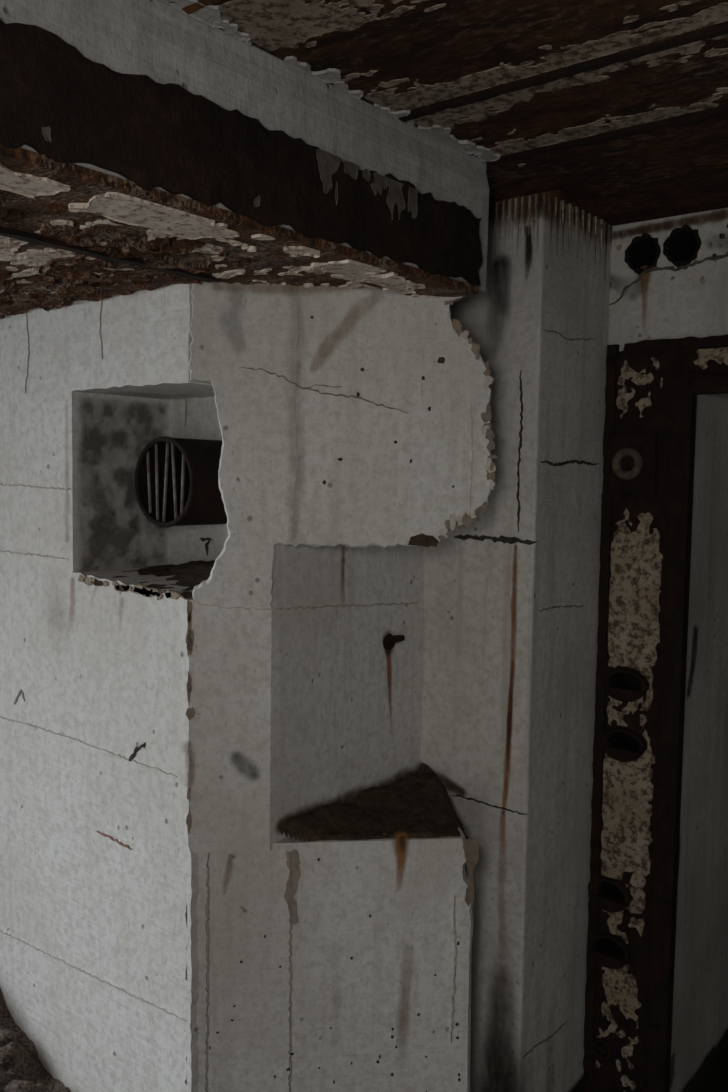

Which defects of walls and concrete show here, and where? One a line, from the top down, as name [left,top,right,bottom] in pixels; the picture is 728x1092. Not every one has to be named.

peeling [161,0,728,167]
peeling [0,164,453,319]
crack [609,252,728,305]
leakage [81,402,165,571]
crack [239,290,407,540]
crack [454,370,598,545]
peeling [616,357,663,418]
corrosion [384,633,392,704]
corrosion [502,545,517,831]
peeling [601,508,663,944]
corrosion [395,833,408,875]
peeling [596,964,642,1092]